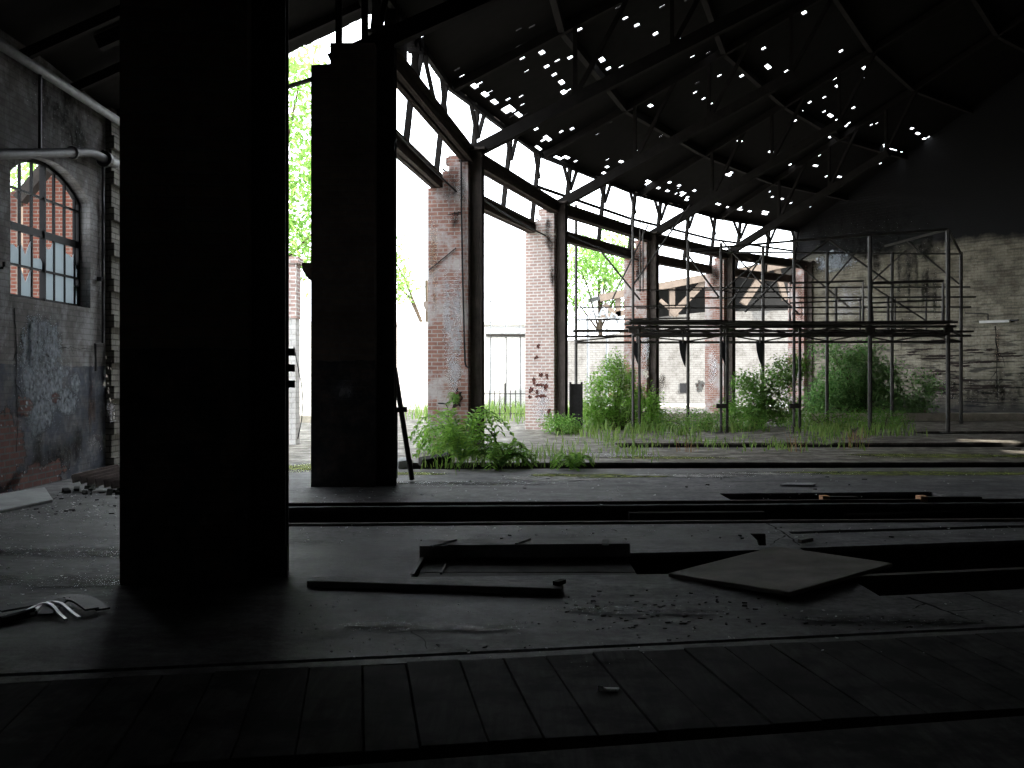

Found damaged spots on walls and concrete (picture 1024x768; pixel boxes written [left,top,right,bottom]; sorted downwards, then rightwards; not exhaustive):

peeling [0,316,80,494]
hole [528,373,551,416]